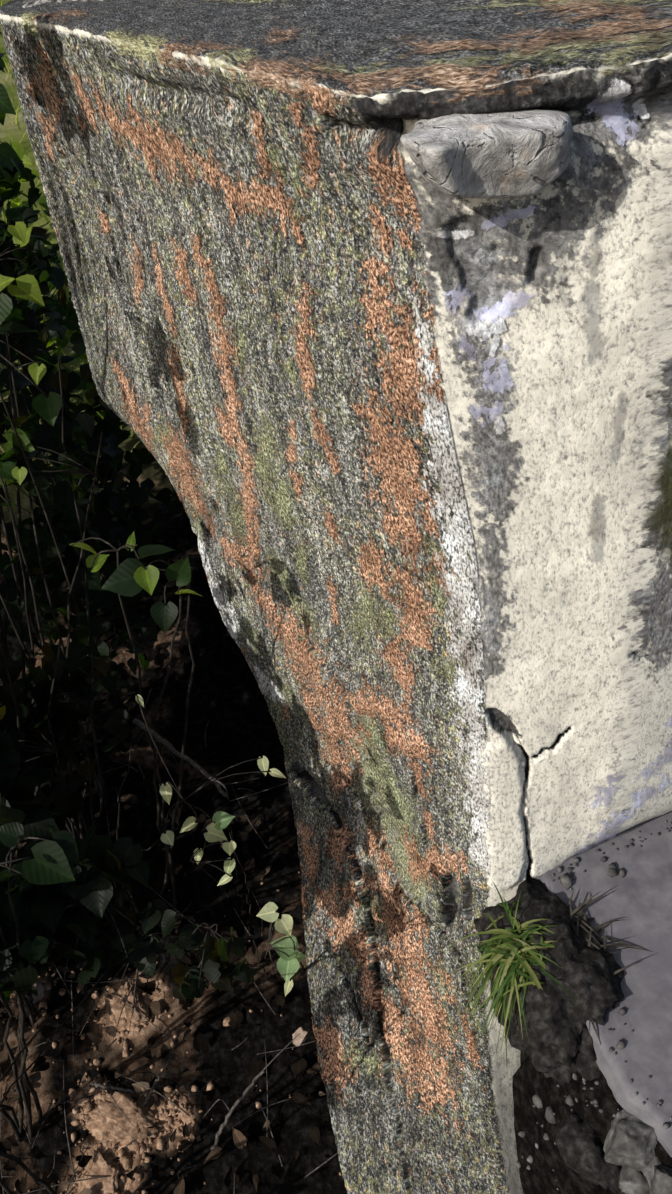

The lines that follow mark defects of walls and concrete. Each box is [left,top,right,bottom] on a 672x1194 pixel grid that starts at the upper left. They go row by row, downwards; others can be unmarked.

leakage [388,57,672,681]
crack [510,727,571,877]